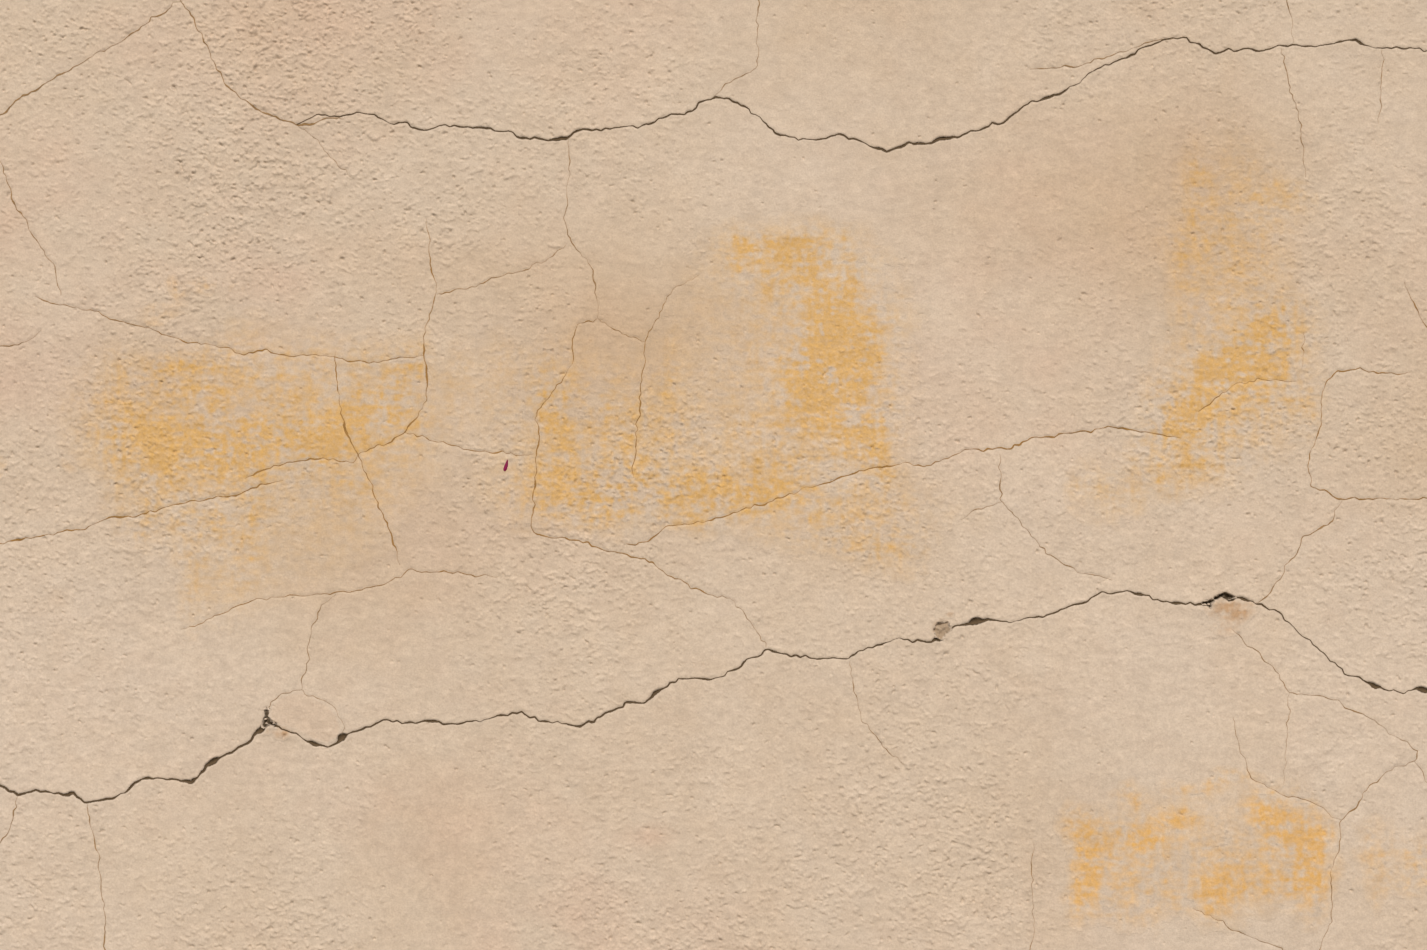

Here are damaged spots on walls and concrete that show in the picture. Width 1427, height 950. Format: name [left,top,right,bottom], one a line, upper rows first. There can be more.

crack [0,0,1427,302]
crack [0,163,1179,950]
crack [952,367,1427,694]
crack [1199,333,1305,411]
crack [1197,910,1283,950]
crack [1233,630,1426,950]